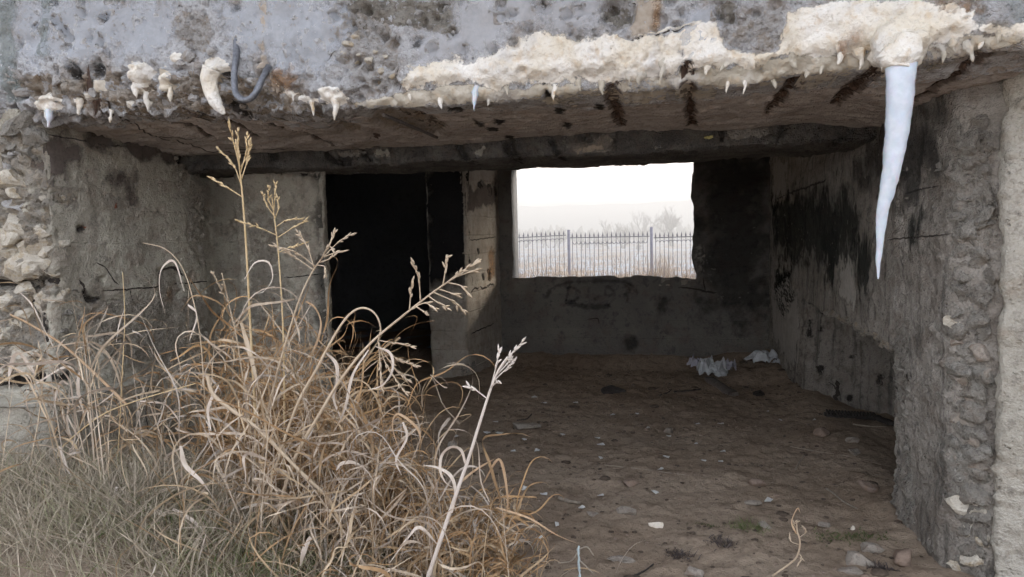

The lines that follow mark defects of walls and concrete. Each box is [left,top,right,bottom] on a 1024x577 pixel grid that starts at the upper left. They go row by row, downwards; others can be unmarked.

damp [180,107,258,137]
damp [354,0,1024,251]
spalling [0,278,60,342]
crack [97,263,207,297]
damp [770,128,885,374]